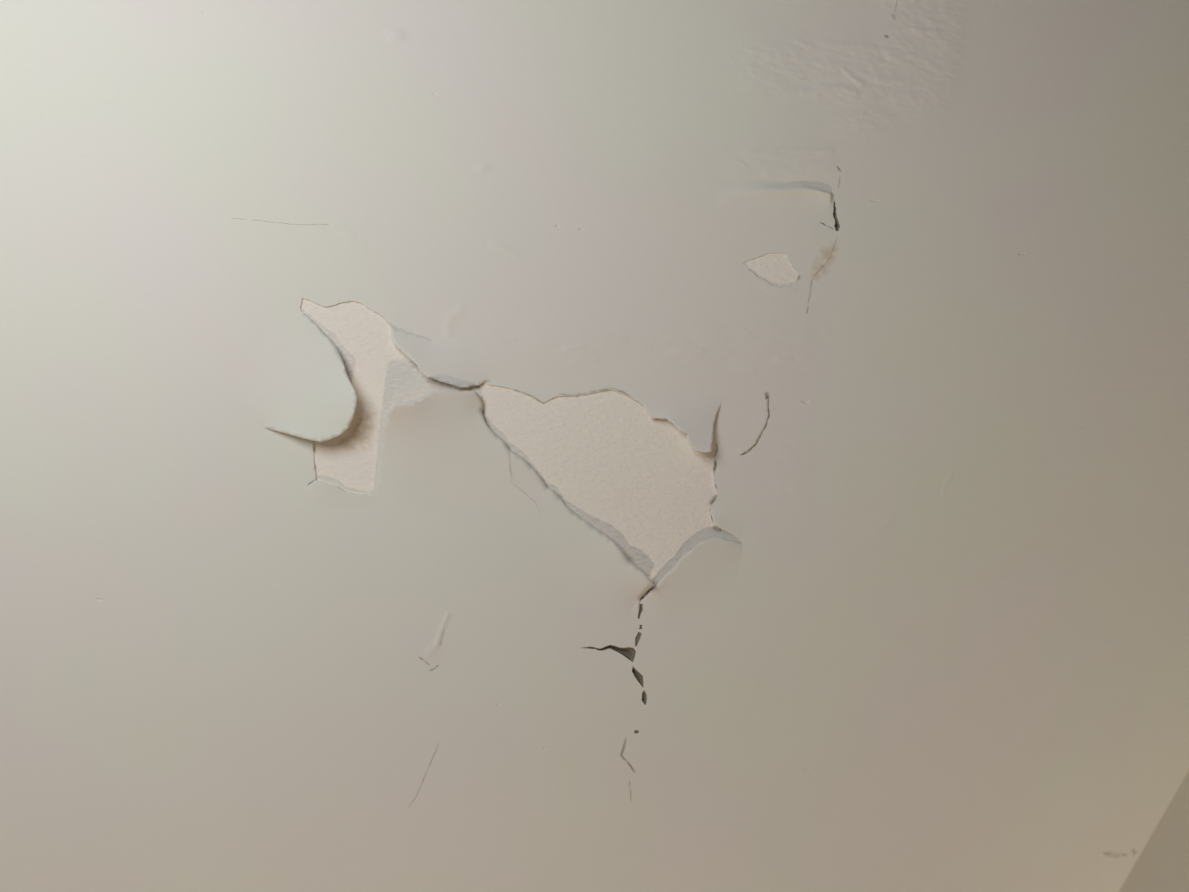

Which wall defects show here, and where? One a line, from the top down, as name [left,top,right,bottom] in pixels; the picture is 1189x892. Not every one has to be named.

peeling [743,253,801,297]
peeling [239,298,753,624]
crack [583,595,647,734]